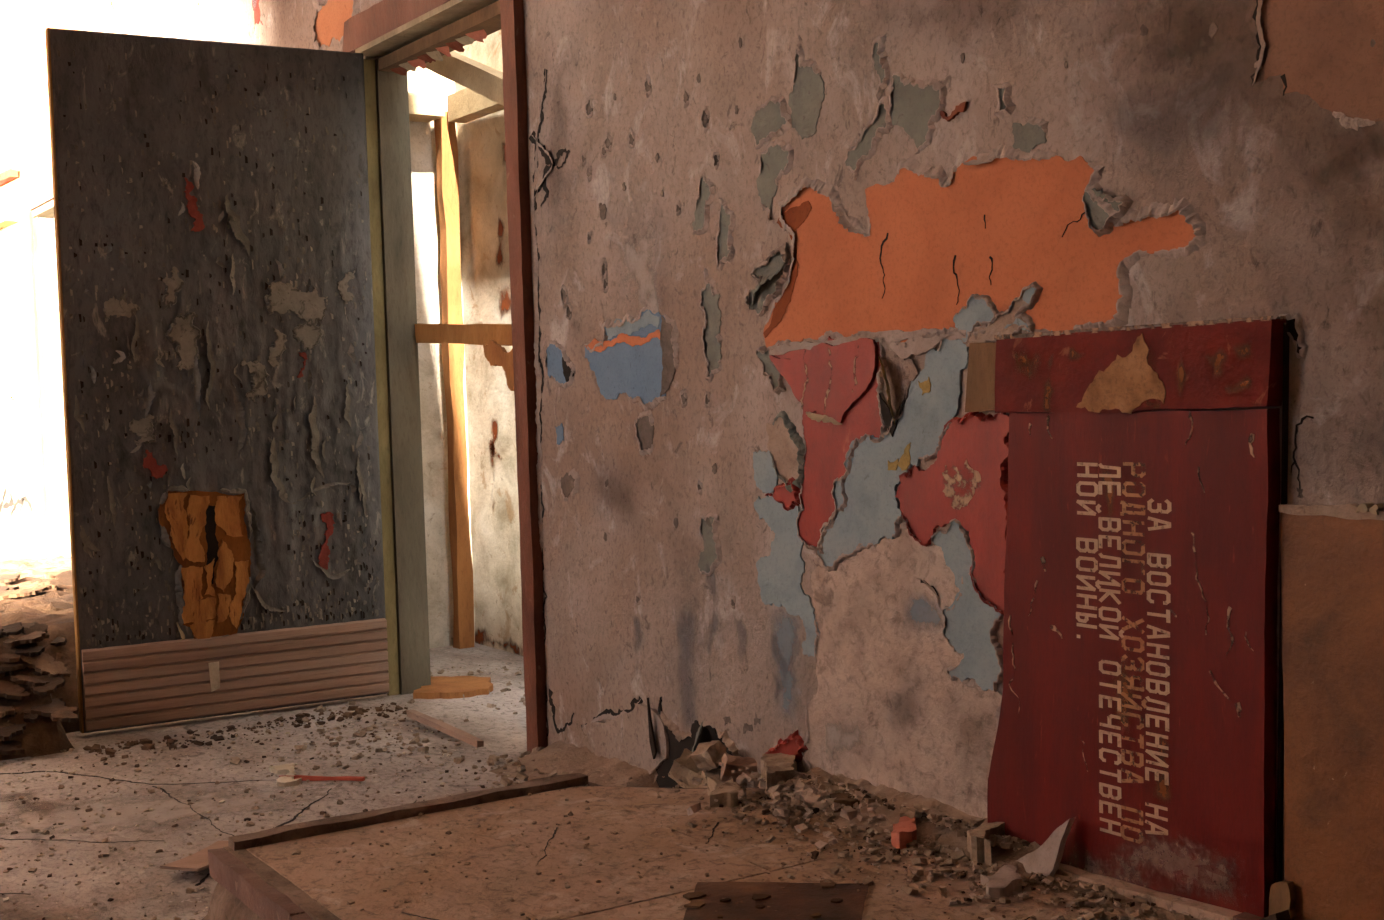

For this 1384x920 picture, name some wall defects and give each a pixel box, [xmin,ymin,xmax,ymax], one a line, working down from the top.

peeling [312,0,360,50]
peeling [1253,0,1384,132]
crack [529,69,570,644]
spalling [545,151,735,456]
peeling [654,35,1207,818]
crack [545,685,643,736]